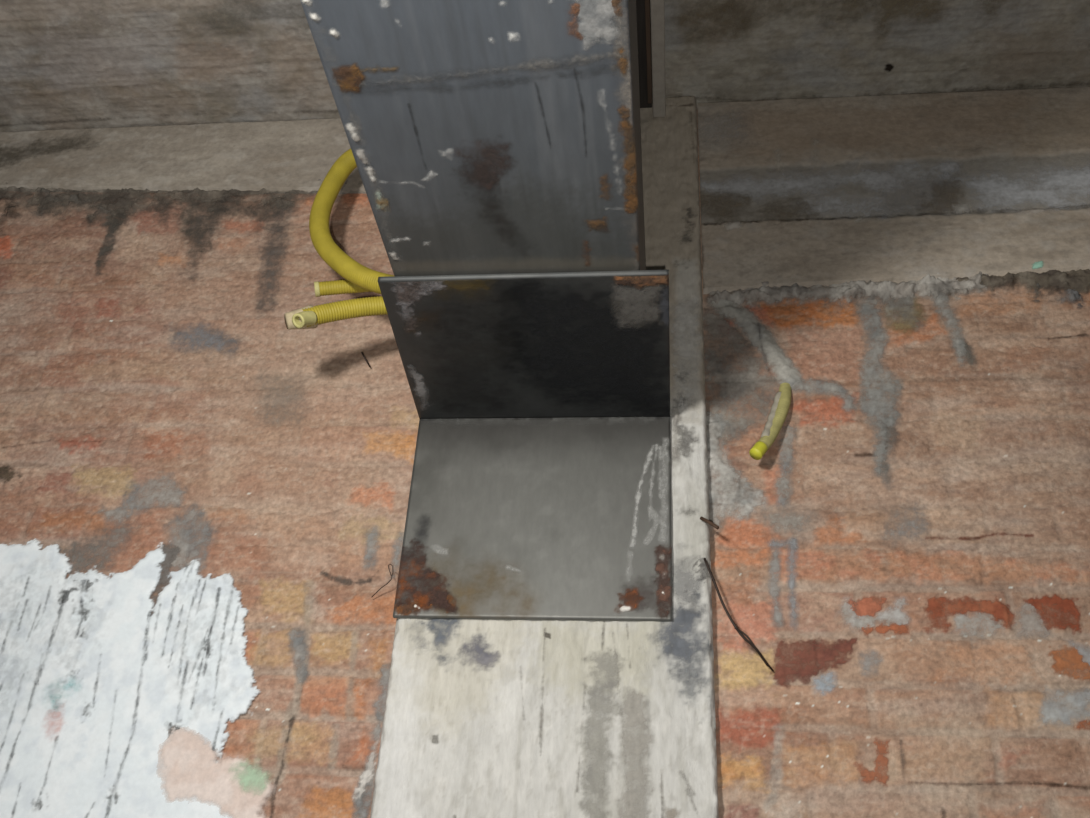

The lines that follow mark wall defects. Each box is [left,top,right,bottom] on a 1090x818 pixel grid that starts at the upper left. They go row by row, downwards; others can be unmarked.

rust [333,64,397,92]
rust [618,107,638,213]
leakage [96,213,127,273]
leakage [258,199,292,309]
rust [395,540,457,615]
rust [619,589,643,609]
rust [654,545,672,618]
peeling [0,539,272,818]